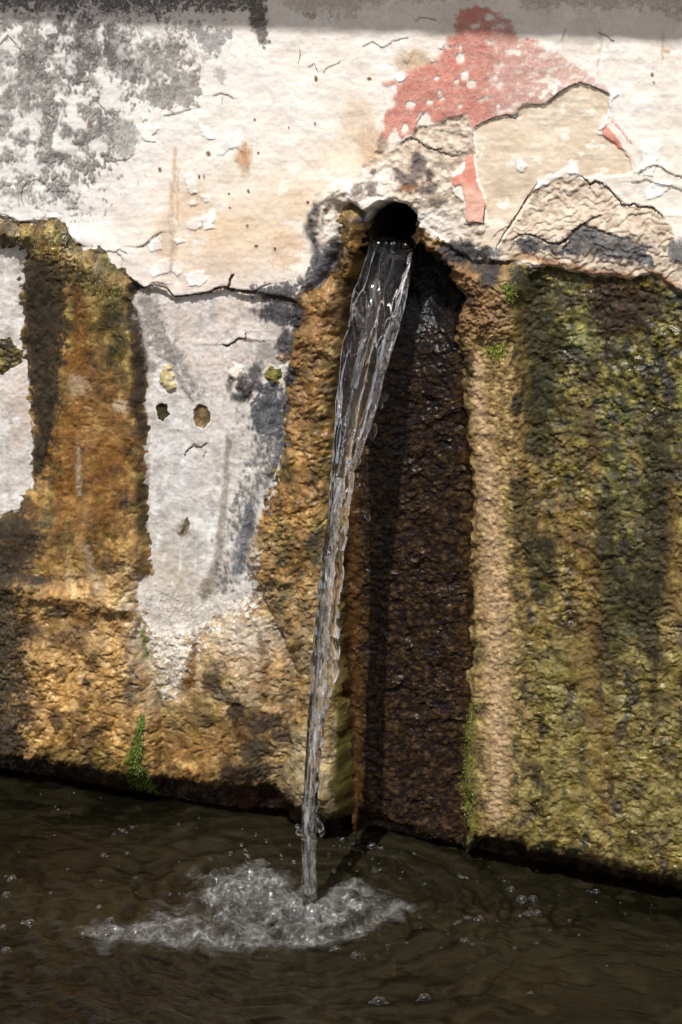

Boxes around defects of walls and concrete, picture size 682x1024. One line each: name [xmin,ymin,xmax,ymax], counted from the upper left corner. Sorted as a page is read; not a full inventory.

mould [0,0,270,226]
crack [103,233,297,303]
spalling [129,173,294,634]
damp [436,238,502,287]
spalling [358,6,682,291]
damp [519,271,569,454]
crack [492,164,681,249]
damp [586,278,663,345]
damp [0,190,341,812]
damp [512,472,556,597]
damp [590,417,673,735]